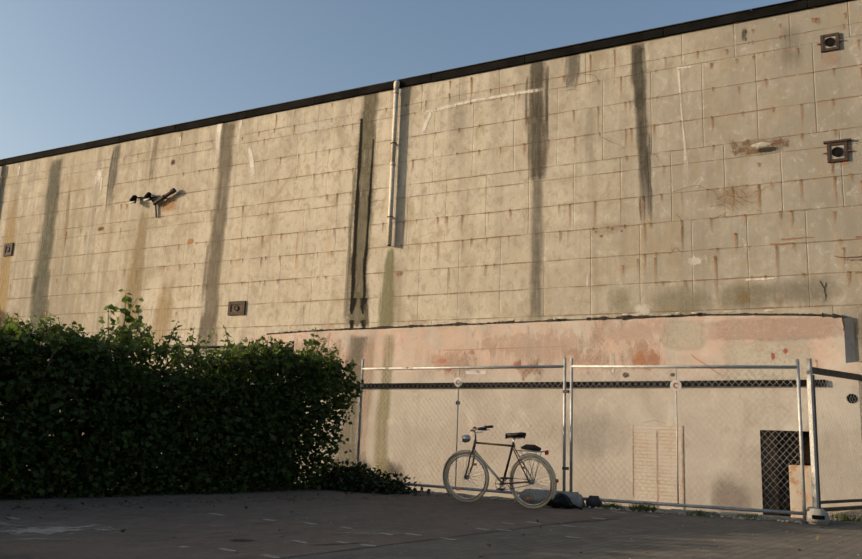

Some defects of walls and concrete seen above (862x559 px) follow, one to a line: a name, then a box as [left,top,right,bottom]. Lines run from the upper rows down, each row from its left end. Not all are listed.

leakage [30,160,61,334]
leakage [200,119,242,345]
leakage [336,93,402,481]
leakage [422,61,548,309]
leakage [632,45,651,213]
spalling [731,138,788,154]